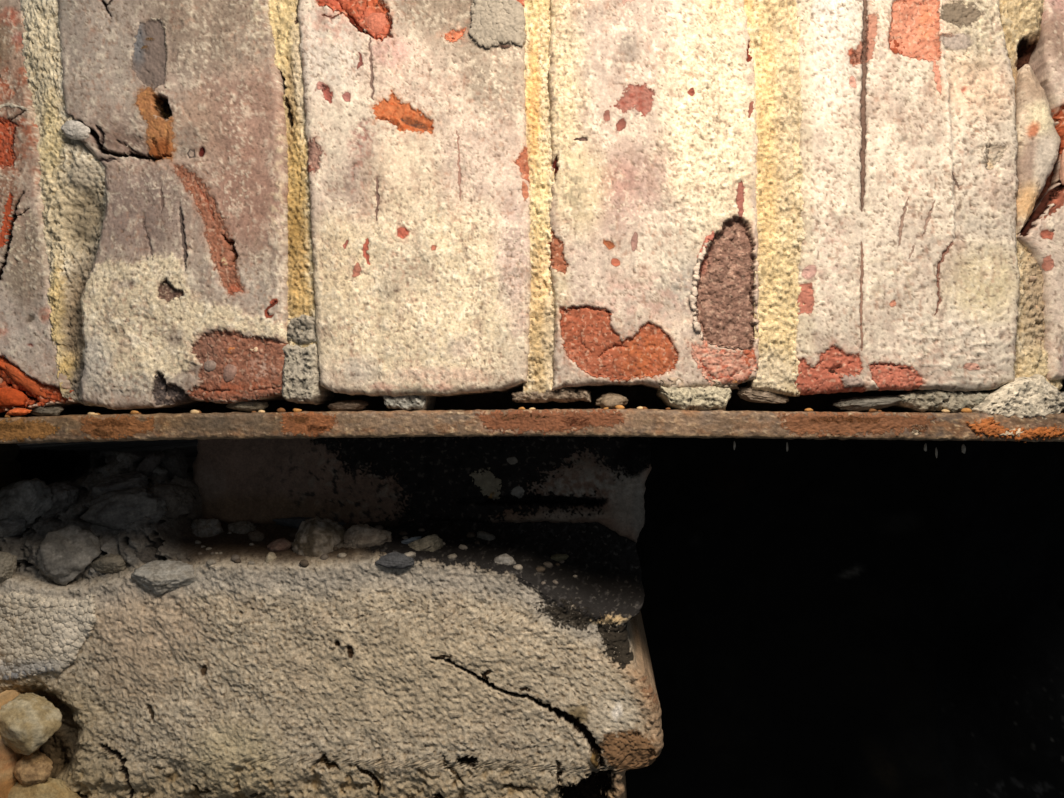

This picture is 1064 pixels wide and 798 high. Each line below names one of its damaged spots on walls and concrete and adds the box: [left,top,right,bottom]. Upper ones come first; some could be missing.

spalling [316,0,392,42]
crack [860,0,868,211]
crack [81,122,161,162]
crack [0,192,29,280]
spalling [560,218,758,386]
spalling [152,330,289,406]
spalling [795,344,924,395]
rust [280,411,338,439]
rust [475,409,624,436]
rust [777,411,936,438]
rust [966,417,1064,443]
crack [431,655,605,769]